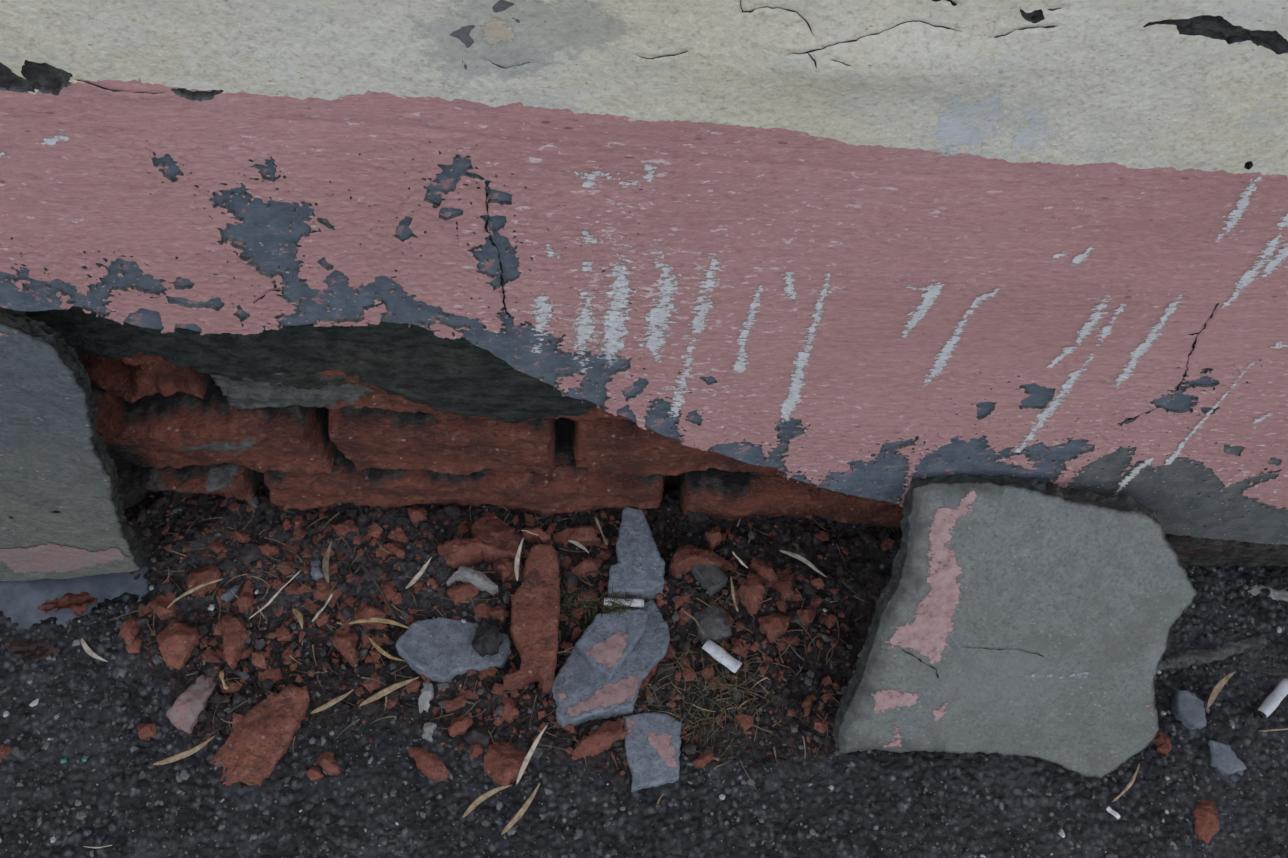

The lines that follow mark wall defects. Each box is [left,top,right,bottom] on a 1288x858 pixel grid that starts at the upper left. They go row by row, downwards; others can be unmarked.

flaking render [0,60,71,89]
crack [740,0,957,69]
flaking render [1175,15,1288,52]
peeling [153,153,181,179]
peeling [425,154,533,287]
crack [484,188,511,318]
water stain [530,243,723,419]
flaking render [0,183,1288,664]
water stain [1014,295,1126,453]
water stain [1053,246,1095,266]
crack [1119,303,1219,426]
water stain [1222,233,1288,308]